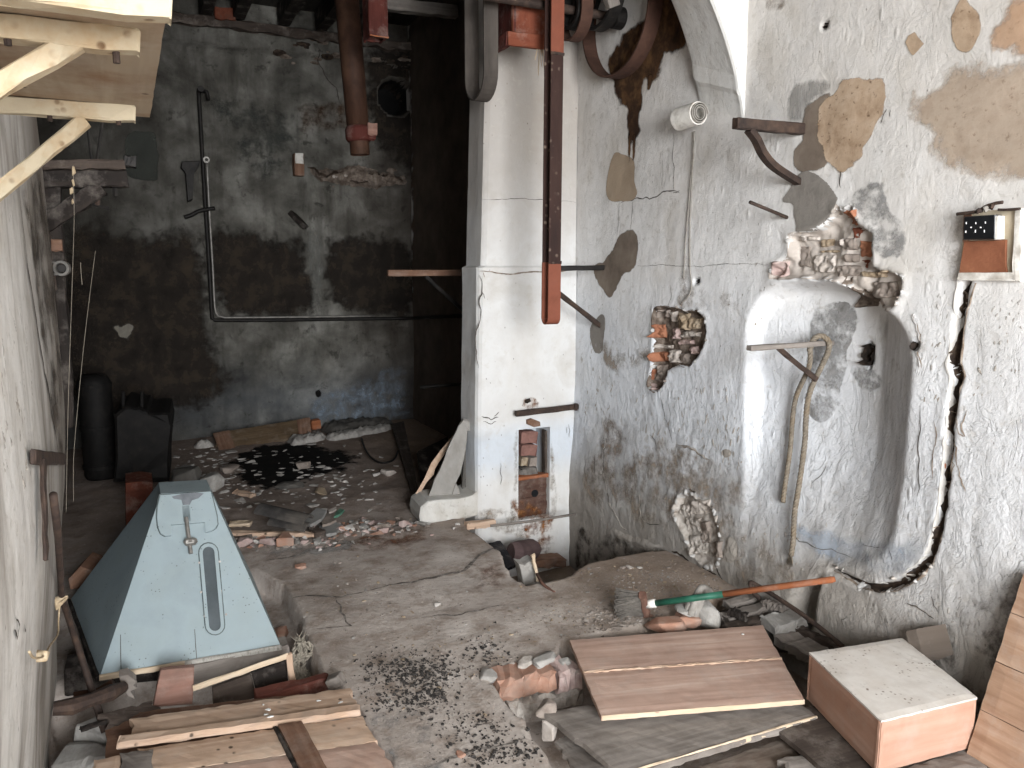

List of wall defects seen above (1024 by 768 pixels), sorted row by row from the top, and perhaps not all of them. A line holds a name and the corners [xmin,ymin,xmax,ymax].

flaking render [905,32,924,55]
flaking render [951,0,1024,54]
flaking render [308,165,407,190]
flaking render [606,152,637,202]
flaking render [594,230,638,297]
flaking render [739,78,905,421]
damp [25,181,413,451]
flaking render [636,305,707,403]
crack [789,280,977,619]
flaking render [671,489,723,572]
crack [293,548,500,629]